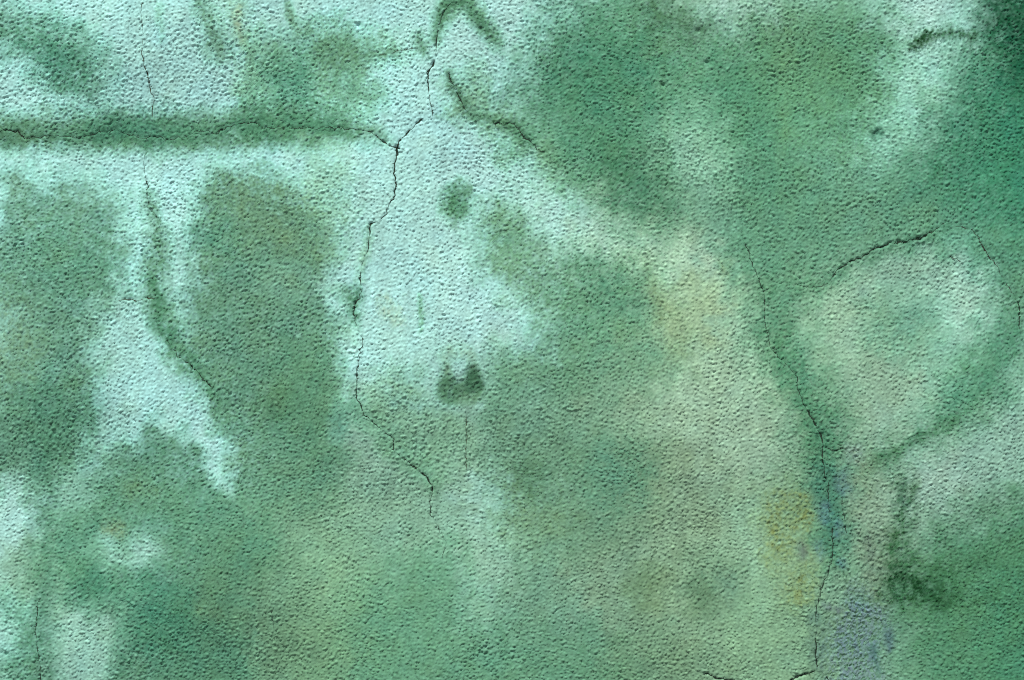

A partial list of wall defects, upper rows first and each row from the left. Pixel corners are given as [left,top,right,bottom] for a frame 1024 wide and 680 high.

crack [2,2,466,555]
crack [493,122,549,154]
crack [745,245,847,680]
crack [796,222,1021,328]